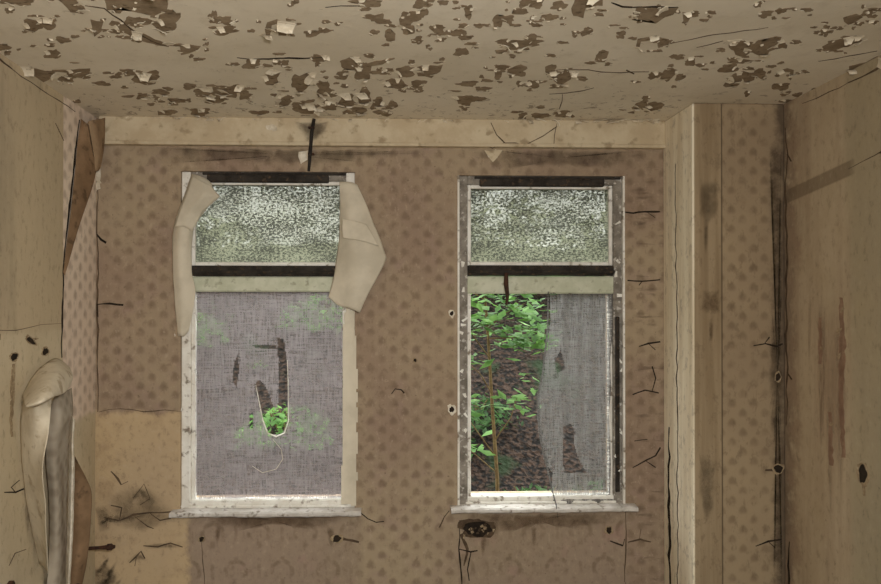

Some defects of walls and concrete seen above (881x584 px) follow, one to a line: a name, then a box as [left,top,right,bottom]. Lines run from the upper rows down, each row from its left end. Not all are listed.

peeling [753,0,881,54]
peeling [0,0,815,131]
peeling [844,55,881,74]